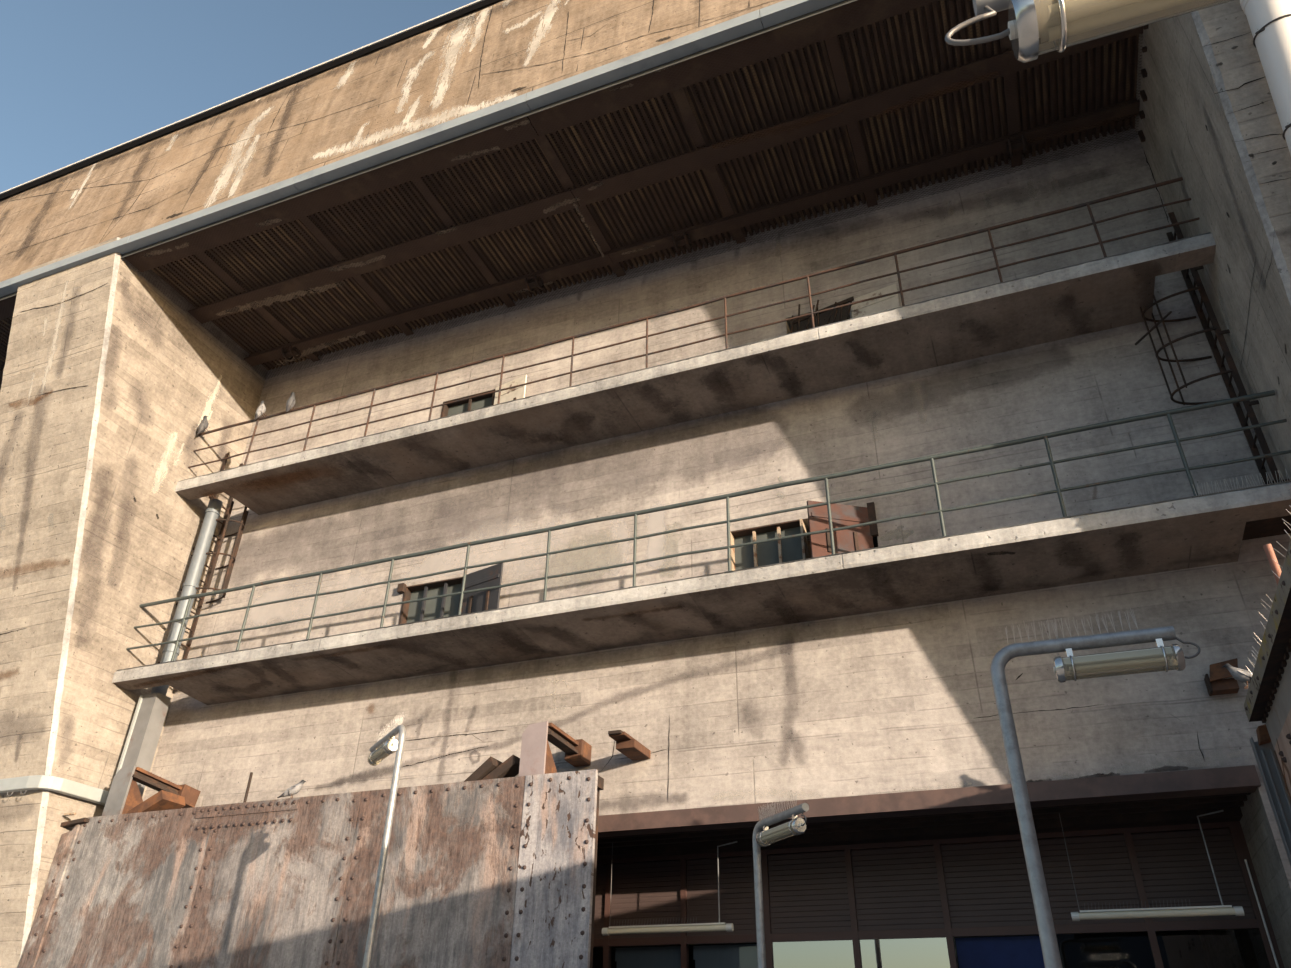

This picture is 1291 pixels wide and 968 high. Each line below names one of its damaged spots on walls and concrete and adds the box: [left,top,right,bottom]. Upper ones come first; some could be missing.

damp [313,0,517,160]
damp [70,164,96,208]
damp [204,98,271,208]